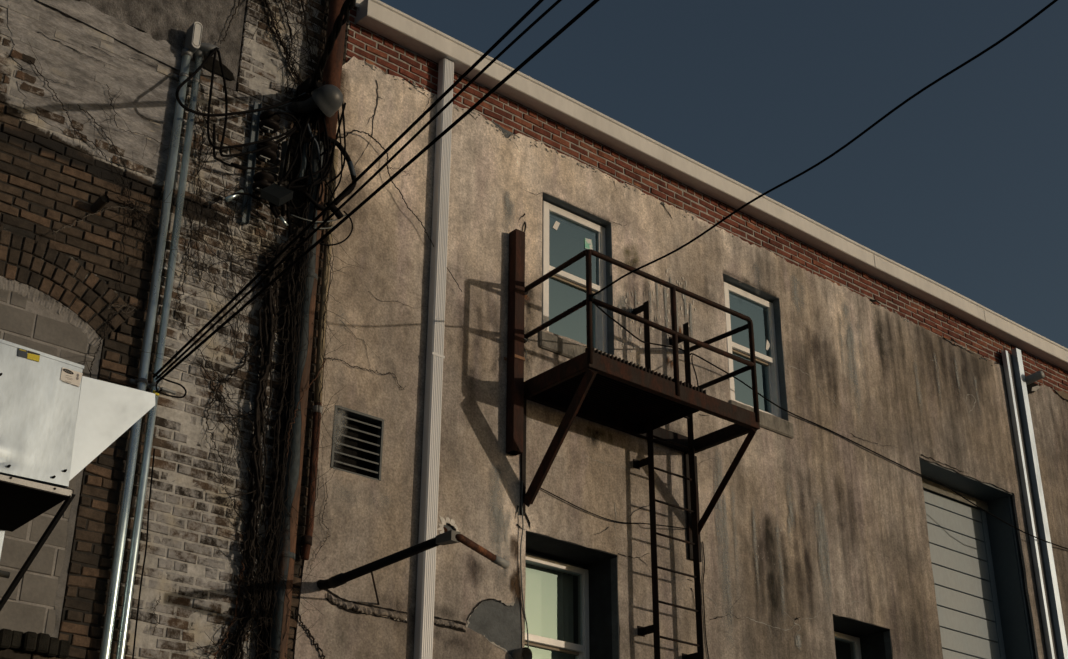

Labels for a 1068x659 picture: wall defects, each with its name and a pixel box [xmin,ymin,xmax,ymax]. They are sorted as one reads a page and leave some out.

spalling [202,56,235,81]
peeling [10,50,157,178]
crack [347,78,434,178]
spalling [455,107,645,195]
damp [840,305,861,394]
spalling [1025,375,1068,402]
damp [753,486,830,607]
spalling [466,596,523,659]